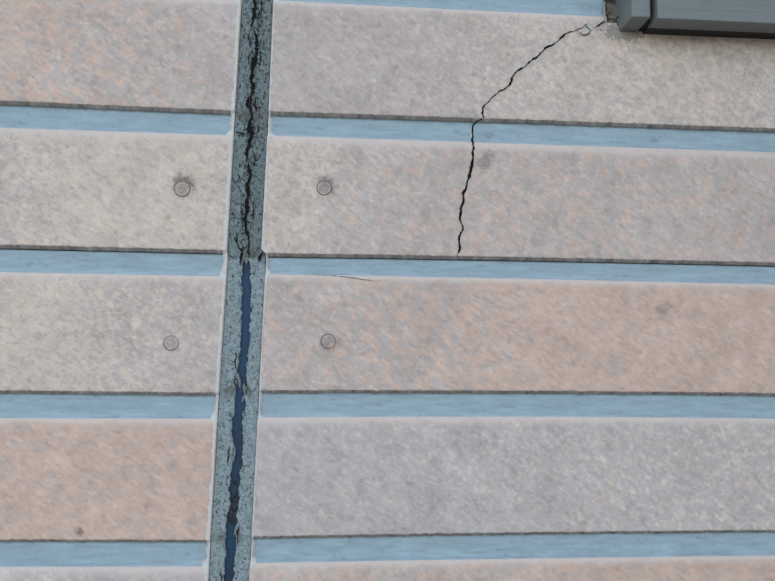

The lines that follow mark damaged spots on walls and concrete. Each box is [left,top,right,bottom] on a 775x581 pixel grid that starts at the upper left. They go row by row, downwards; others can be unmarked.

crack [209,0,272,581]
crack [457,0,619,254]